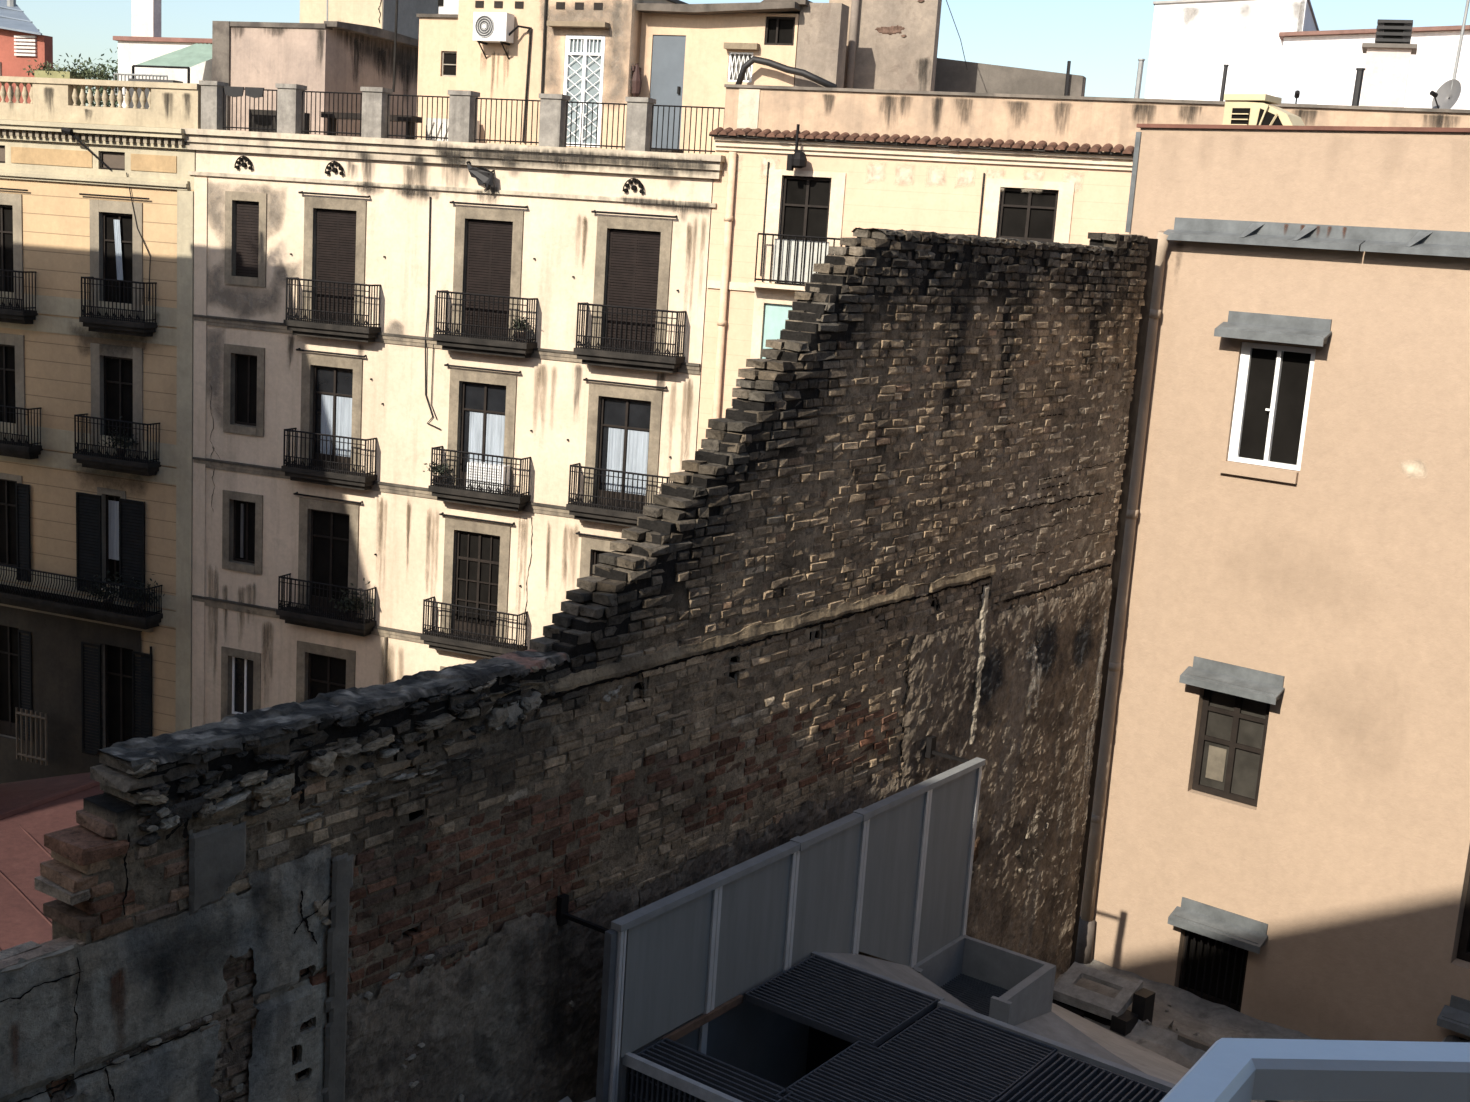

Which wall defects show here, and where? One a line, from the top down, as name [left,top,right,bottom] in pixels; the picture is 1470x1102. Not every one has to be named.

spalling [875,25,906,37]
water stain [919,59,928,84]
water stain [934,98,970,126]
water stain [1134,104,1153,119]
water stain [348,153,376,191]
water stain [397,145,706,195]
water stain [623,197,708,212]
crack [504,461,1114,708]
water stain [1030,644,1041,696]
crack [0,958,210,1102]
flaking render [106,948,270,1102]